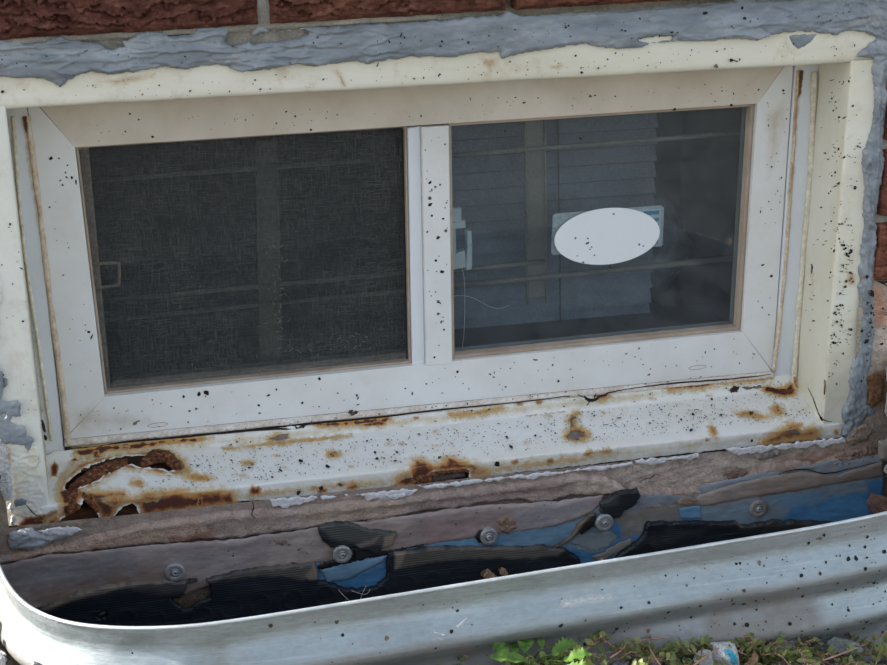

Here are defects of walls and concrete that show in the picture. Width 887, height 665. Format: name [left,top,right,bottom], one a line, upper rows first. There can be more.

corrosion [249,417,393,458]
corrosion [394,400,612,486]
corrosion [666,372,821,446]
corrosion [19,436,283,526]
corrosion [312,480,361,493]